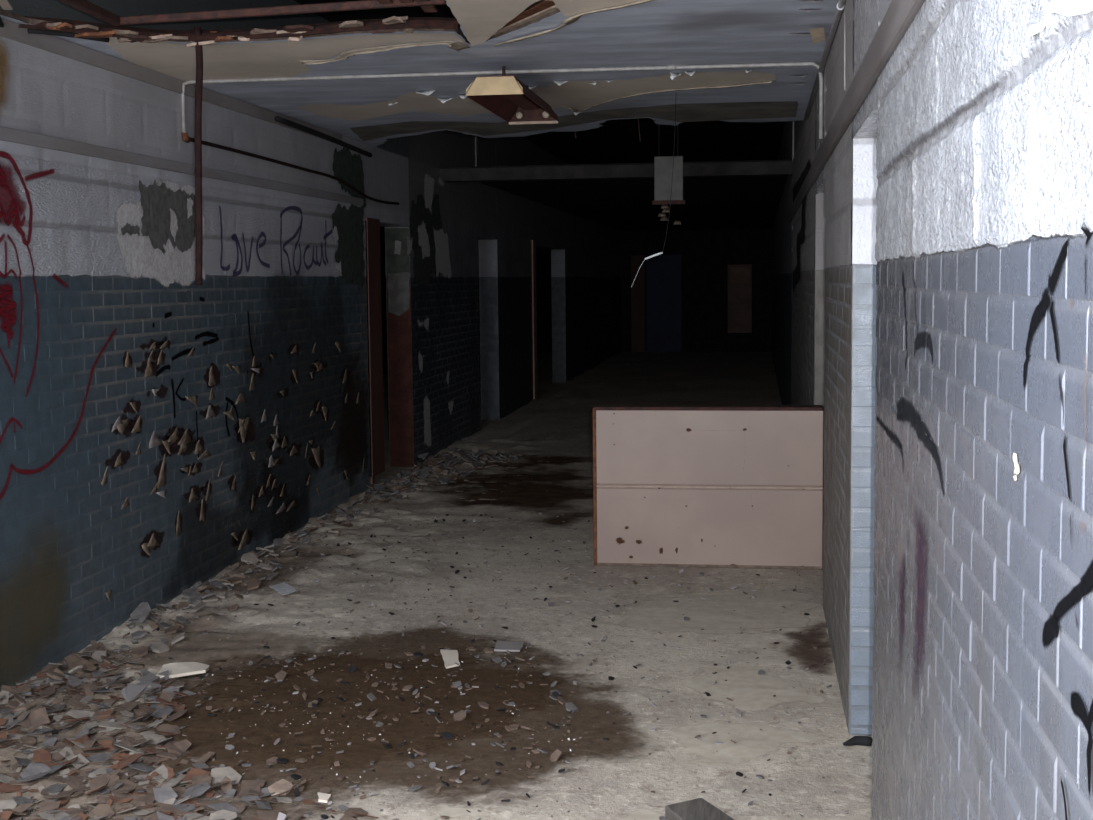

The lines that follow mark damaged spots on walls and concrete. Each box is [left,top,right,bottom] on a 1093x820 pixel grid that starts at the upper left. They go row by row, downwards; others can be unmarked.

peeling [18,0,655,85]
spalling [116,180,206,286]
peeling [101,336,236,558]
peeling [185,342,367,514]